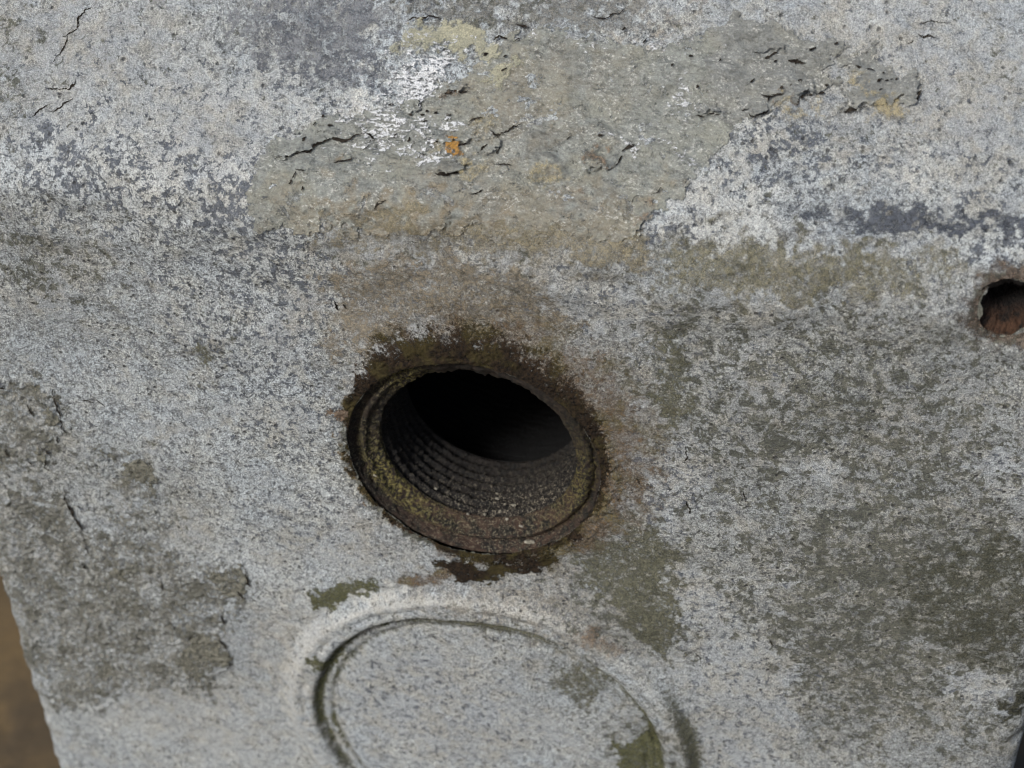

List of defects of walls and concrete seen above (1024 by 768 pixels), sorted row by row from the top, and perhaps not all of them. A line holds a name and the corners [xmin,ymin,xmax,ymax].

crack [53,8,91,62]
crack [34,79,76,116]
peeling [245,9,920,246]
crack [275,132,374,178]
rust [435,132,484,181]
rust [954,257,1024,350]
rust [326,314,671,586]